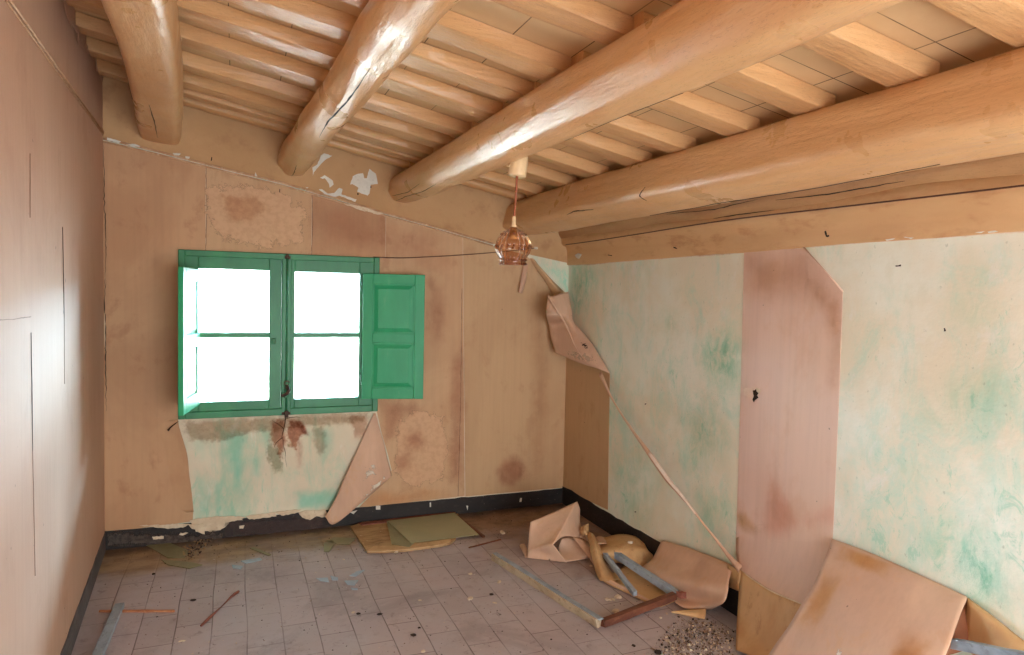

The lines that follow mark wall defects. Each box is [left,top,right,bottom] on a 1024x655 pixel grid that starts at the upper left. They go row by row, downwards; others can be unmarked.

crack [320,68,370,135]
damp [202,184,310,250]
peeling [306,153,384,215]
crack [639,164,940,219]
spalling [743,386,761,402]
damp [393,410,448,487]
peeling [599,371,742,591]